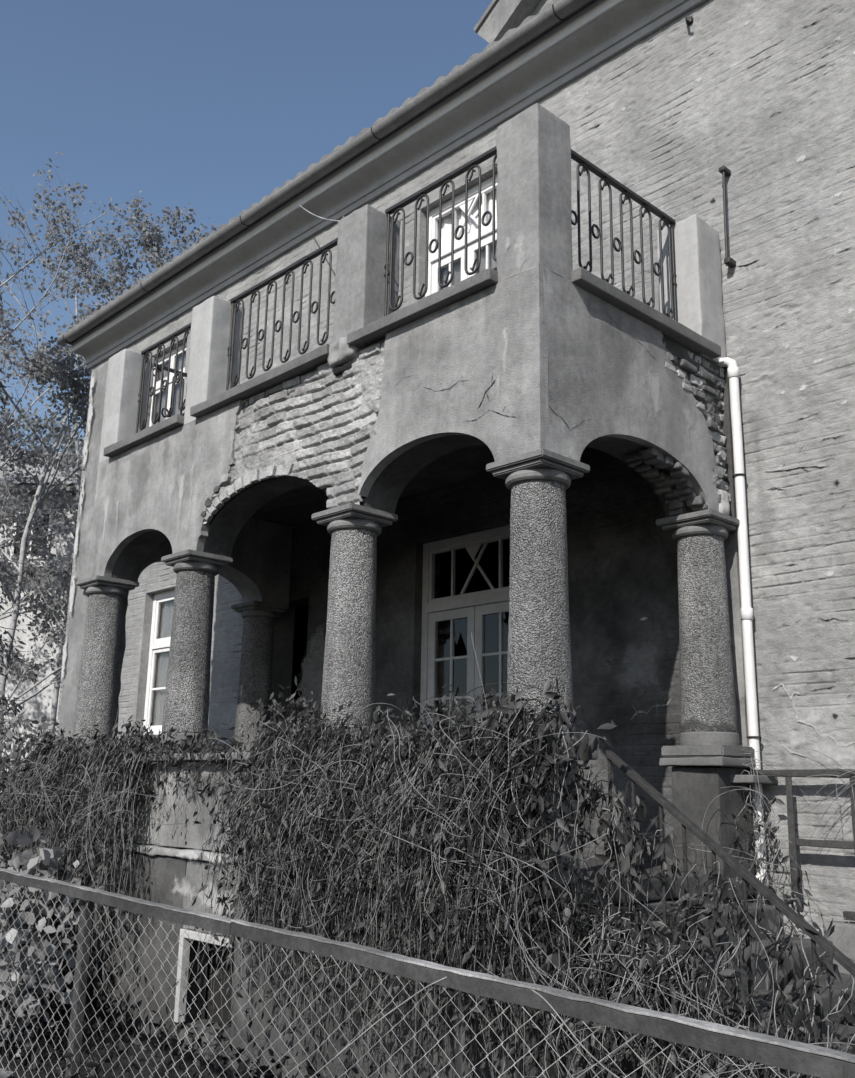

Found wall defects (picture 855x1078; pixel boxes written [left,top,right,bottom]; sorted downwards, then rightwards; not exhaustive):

flaking render [200,341,385,524]
crack [394,374,515,421]
flaking render [662,333,732,517]